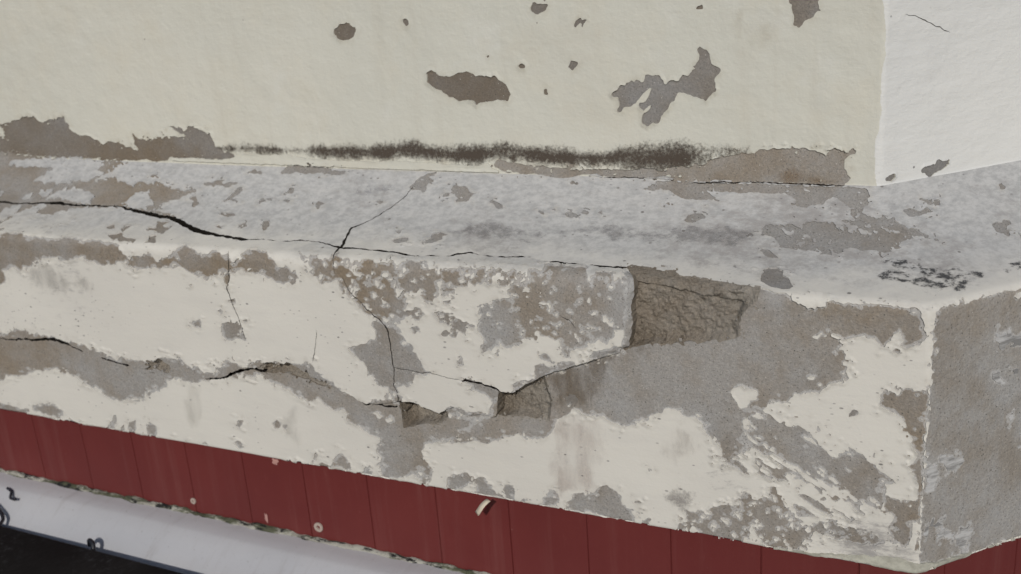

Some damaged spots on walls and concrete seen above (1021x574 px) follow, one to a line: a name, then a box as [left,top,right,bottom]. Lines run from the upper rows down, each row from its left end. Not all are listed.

peeling [334,22,356,41]
peeling [789,0,821,28]
peeling [427,70,510,105]
peeling [612,47,721,126]
leakage [219,145,283,155]
leakage [304,140,740,170]
crack [333,188,459,402]
peeling [0,116,1021,563]